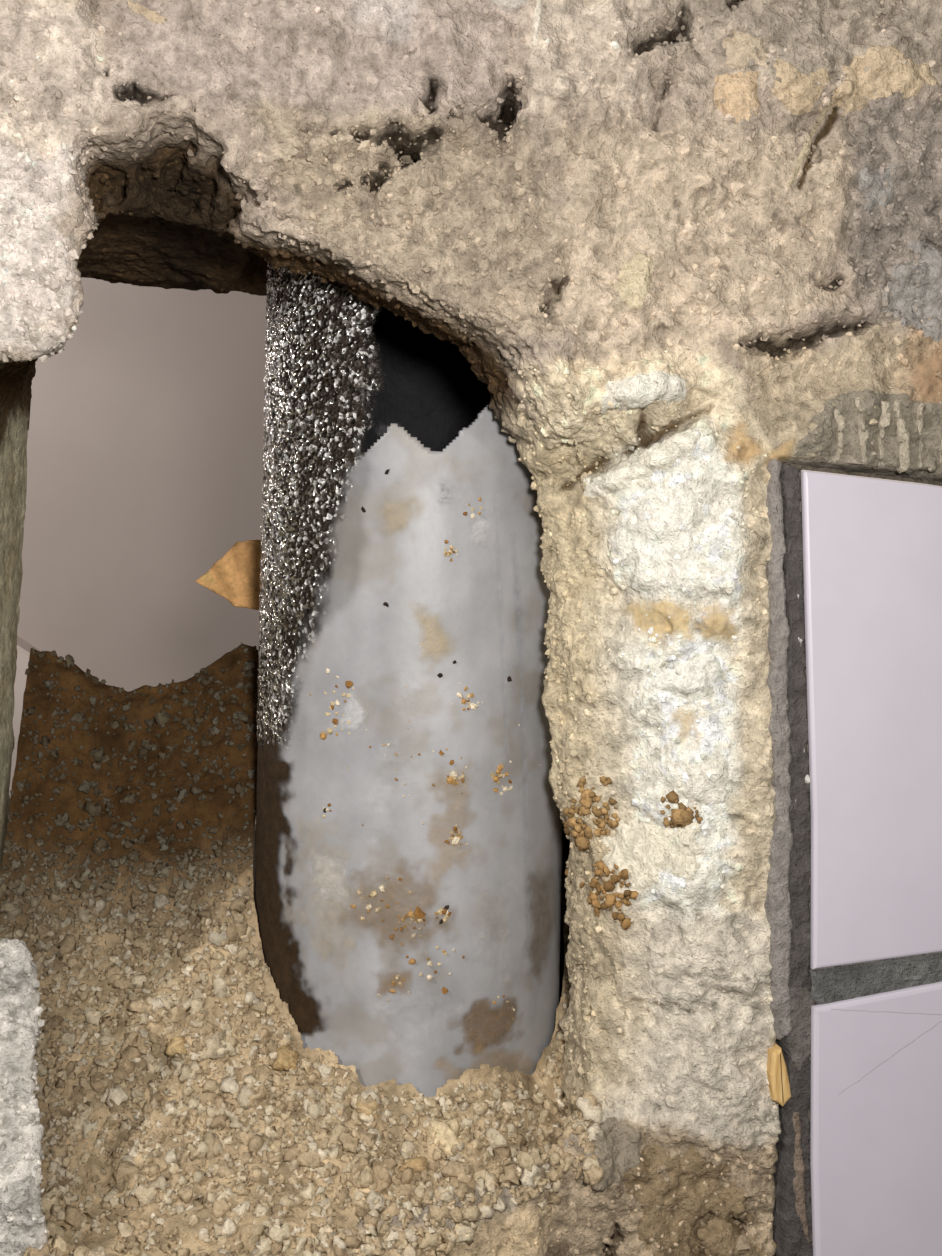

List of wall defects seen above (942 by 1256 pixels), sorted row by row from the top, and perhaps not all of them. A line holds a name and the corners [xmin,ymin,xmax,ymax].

crack [820,279,842,290]
crack [747,321,869,357]